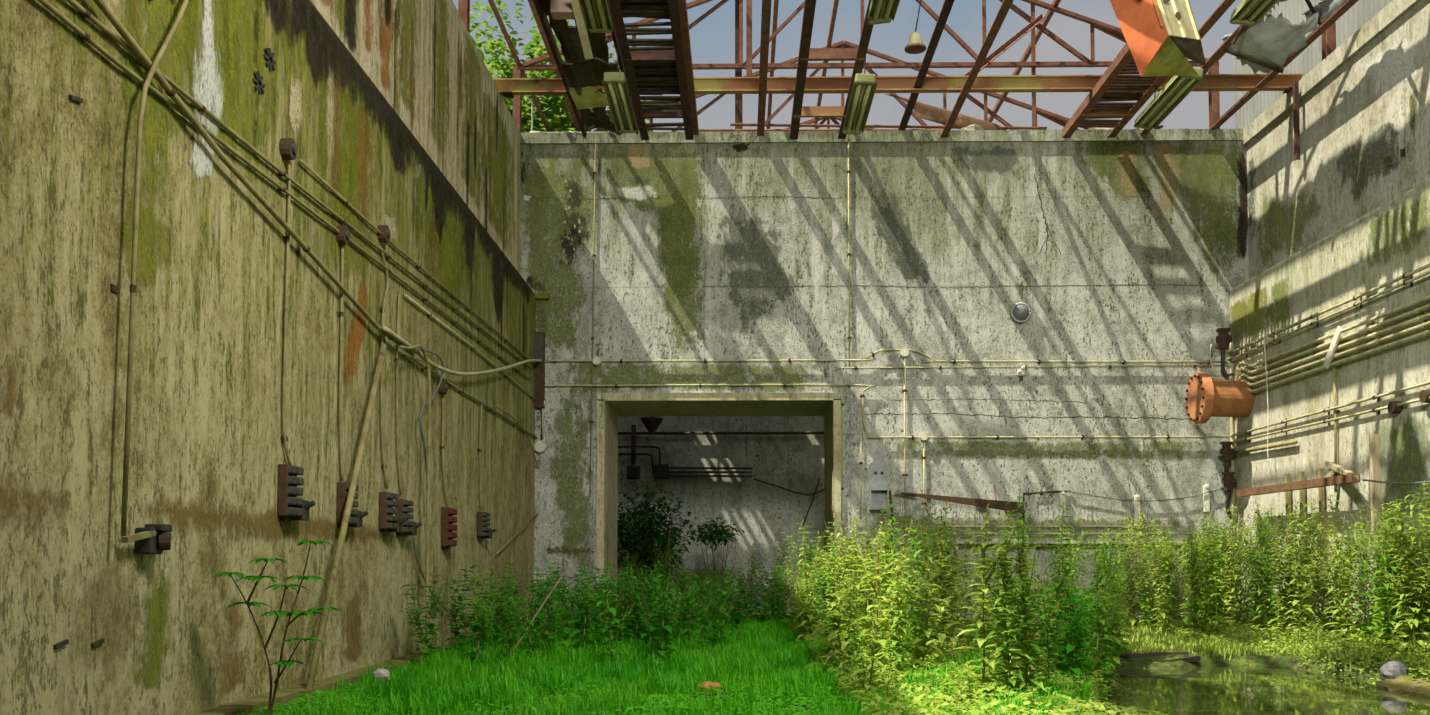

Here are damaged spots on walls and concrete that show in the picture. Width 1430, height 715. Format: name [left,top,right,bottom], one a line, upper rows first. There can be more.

corrosion [364,0,393,90]
damp [120,0,545,385]
corrosion [344,282,367,379]
damp [0,481,70,528]
damp [148,499,396,544]